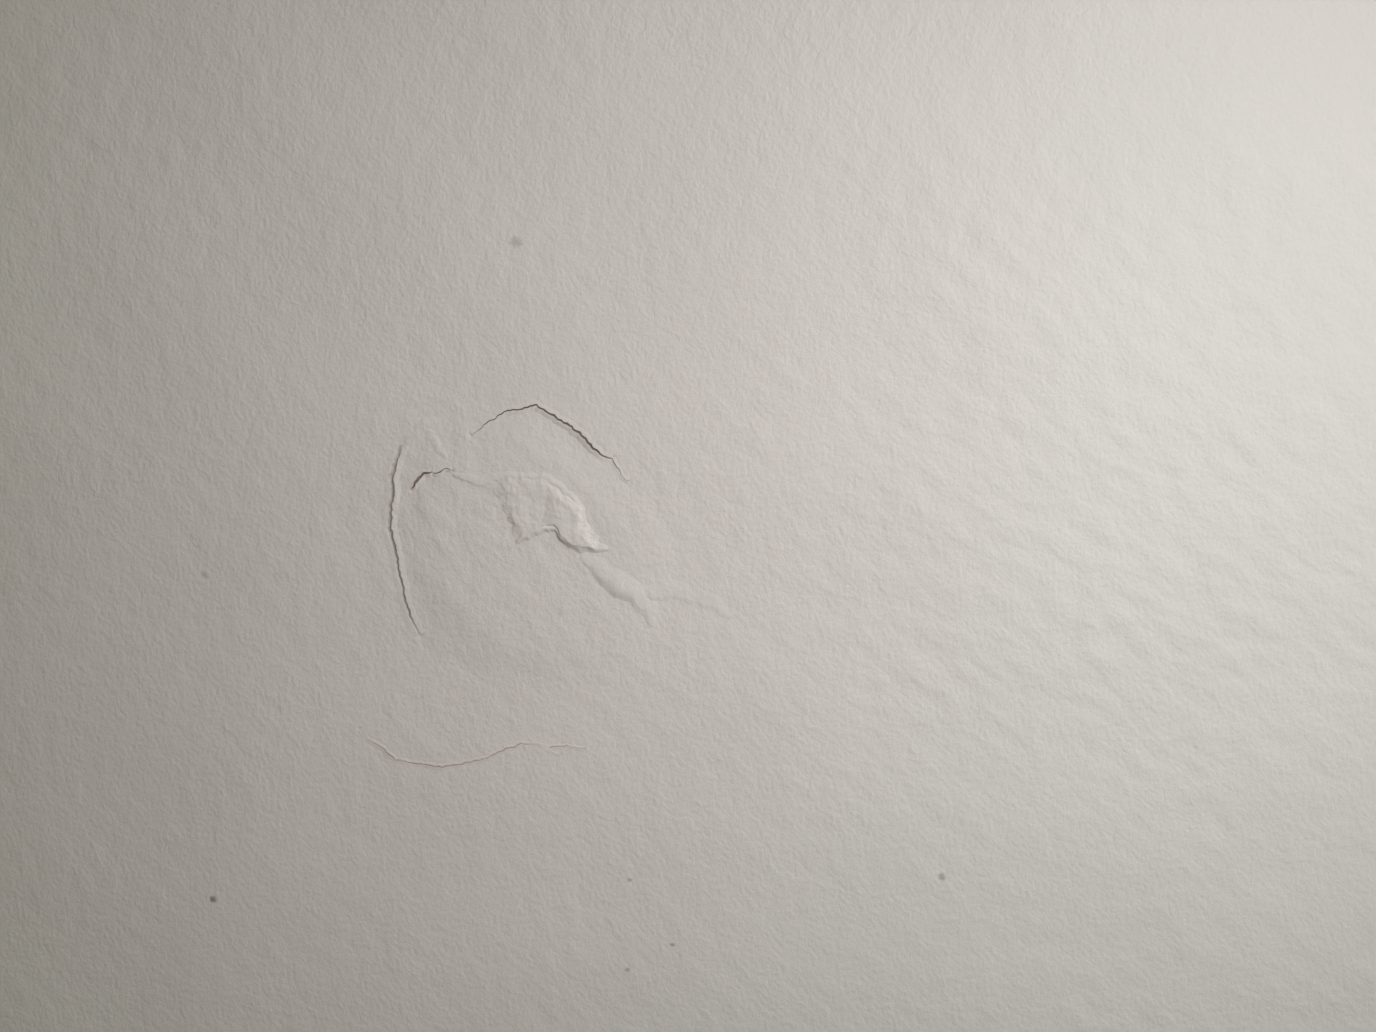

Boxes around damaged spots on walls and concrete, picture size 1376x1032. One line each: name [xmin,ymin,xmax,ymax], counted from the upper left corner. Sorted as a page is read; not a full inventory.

crack [470,399,630,484]
crack [381,443,453,637]
crack [358,728,585,771]